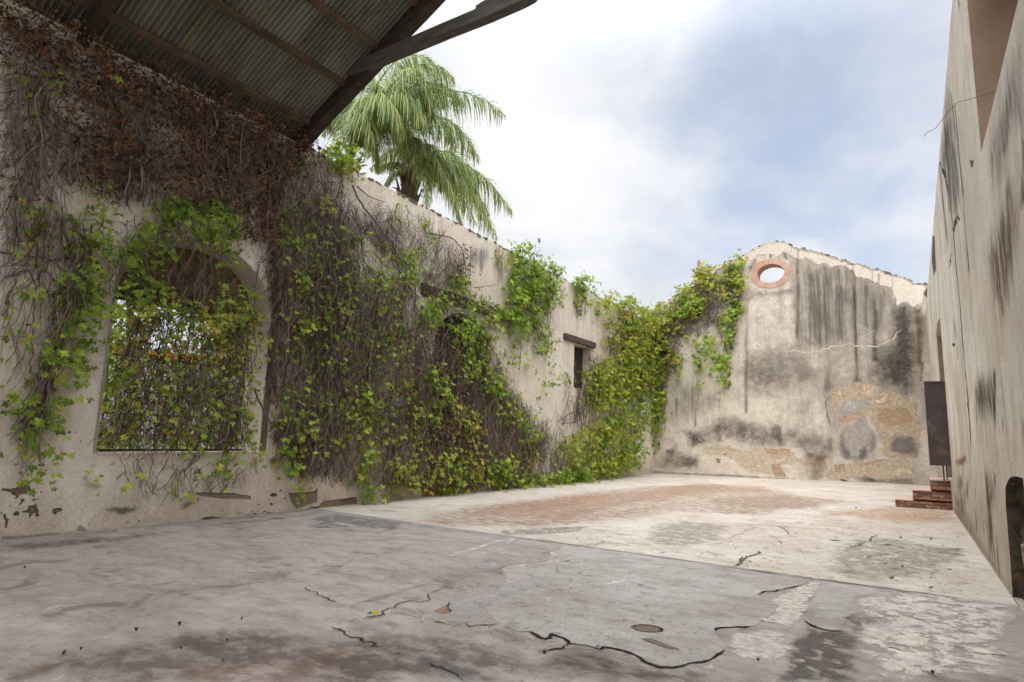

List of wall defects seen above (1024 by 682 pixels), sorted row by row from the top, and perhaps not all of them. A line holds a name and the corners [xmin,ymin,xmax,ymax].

water stain [939,104,963,237]
water stain [991,214,1016,305]
crack [786,330,899,353]
water stain [873,299,915,388]
water stain [692,421,826,473]
peeling [826,383,922,483]
spalling [1,485,62,528]
crack [333,585,493,647]
crack [430,663,466,681]
crack [530,624,749,668]
spalling [632,625,678,649]
peeling [704,508,1018,682]